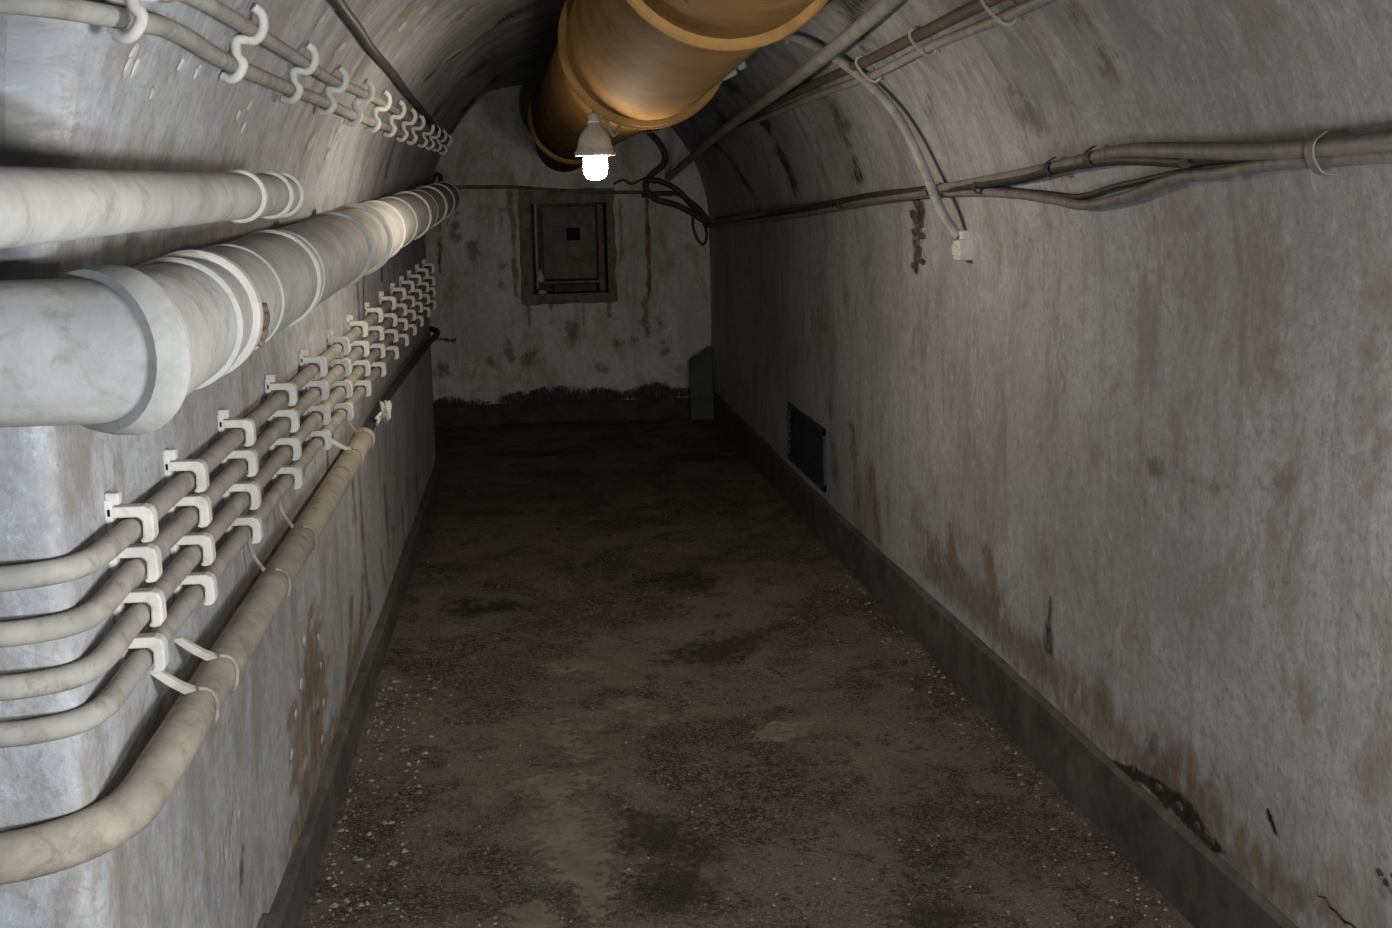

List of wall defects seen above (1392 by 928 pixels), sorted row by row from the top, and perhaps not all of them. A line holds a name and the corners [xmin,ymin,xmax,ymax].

water stain [433,382,690,406]
water stain [334,472,419,738]
water stain [924,523,1305,904]